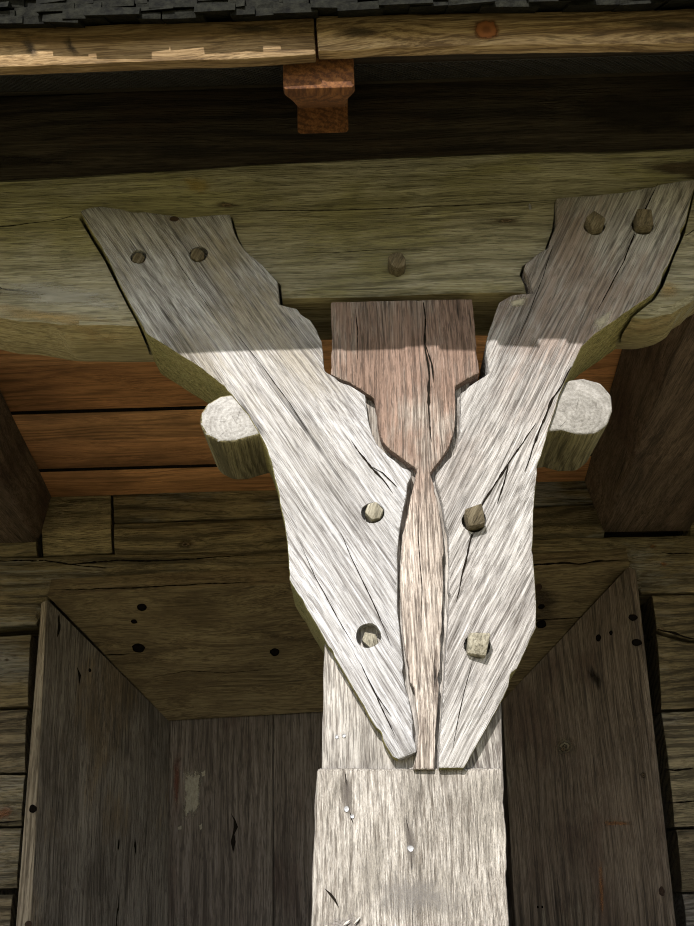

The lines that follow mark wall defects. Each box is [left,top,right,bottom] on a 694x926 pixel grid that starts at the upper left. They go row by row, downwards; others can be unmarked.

crack [423,302,434,442]
crack [352,442,397,492]